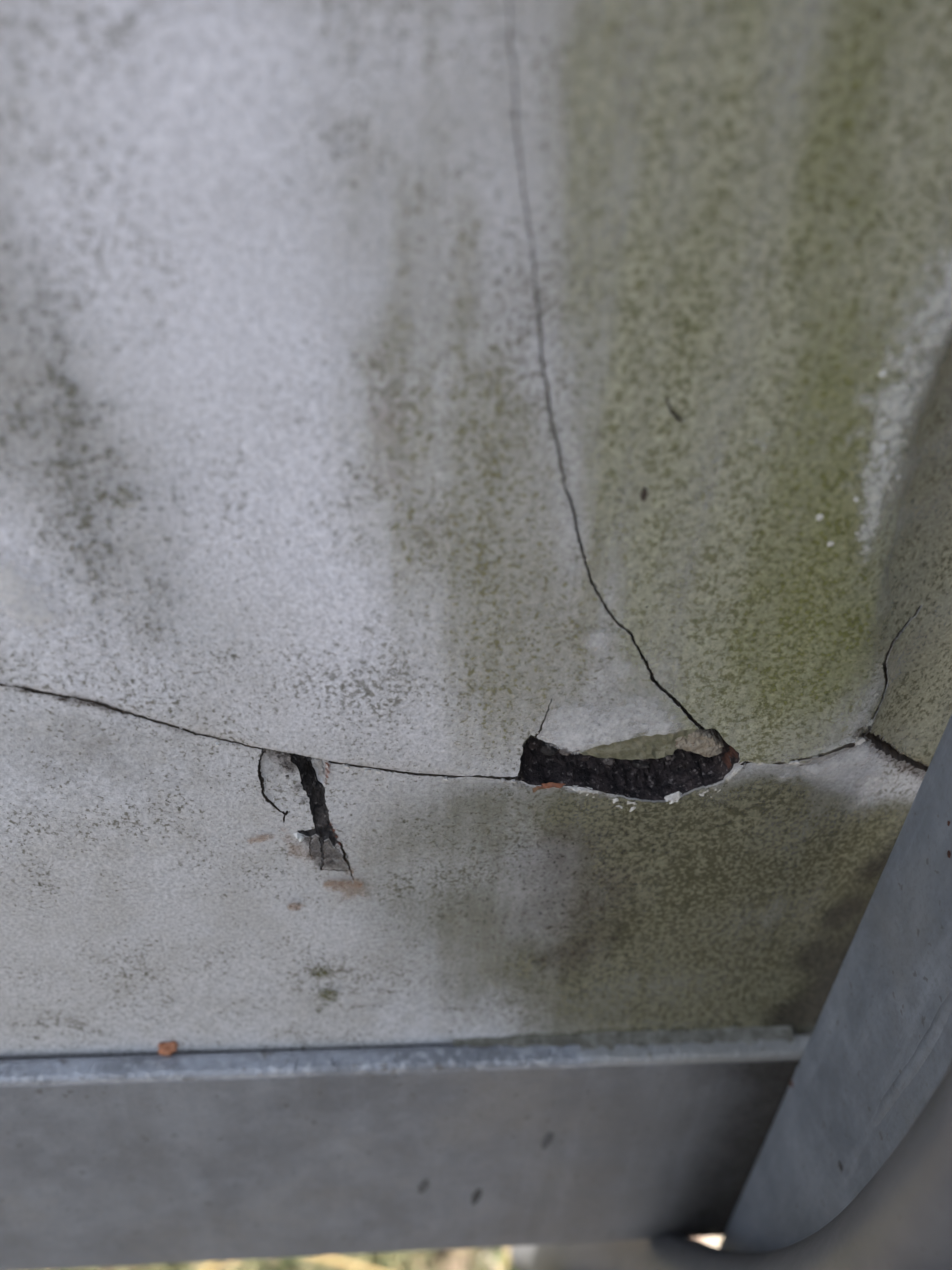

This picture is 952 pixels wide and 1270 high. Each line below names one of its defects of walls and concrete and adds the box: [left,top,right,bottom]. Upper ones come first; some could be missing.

crack [508,0,704,730]
damp [726,1,897,718]
crack [0,683,263,750]
crack [326,760,523,783]
crack [535,698,552,738]
damp [554,700,672,751]
spalling [503,726,742,812]
damp [788,746,869,776]
spalling [257,750,354,880]
damp [772,897,869,1028]